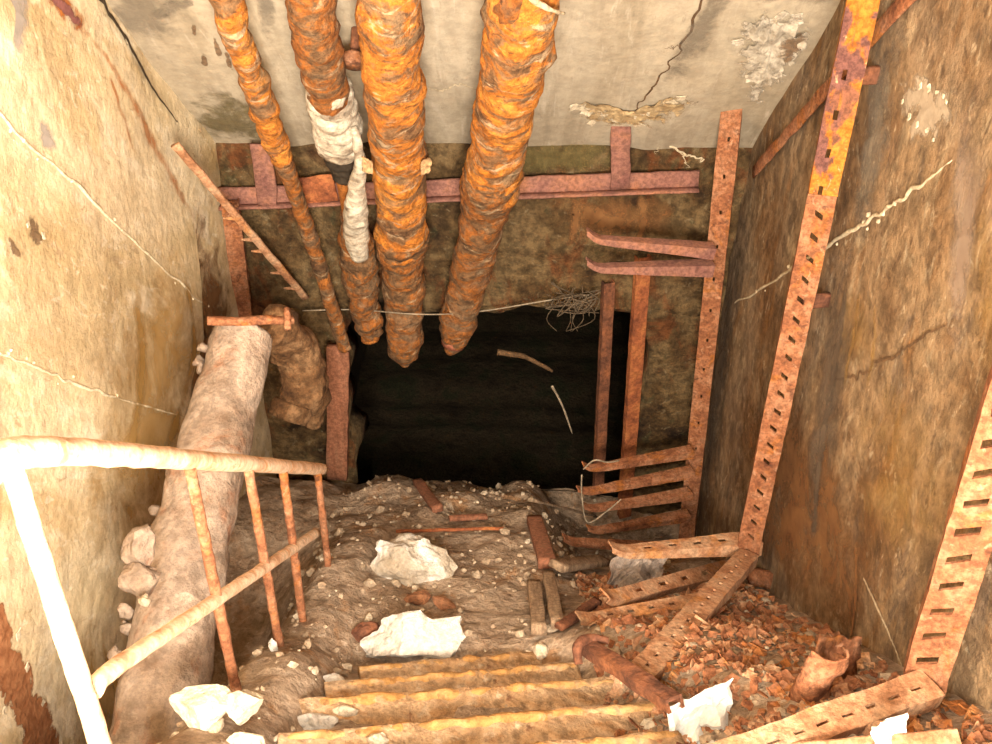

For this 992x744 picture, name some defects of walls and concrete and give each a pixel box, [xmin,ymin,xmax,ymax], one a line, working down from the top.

rust [52,0,83,30]
crack [99,0,178,122]
crack [635,0,703,111]
spalling [731,10,811,103]
rust [134,102,166,165]
spalling [569,96,698,128]
crack [844,323,948,382]